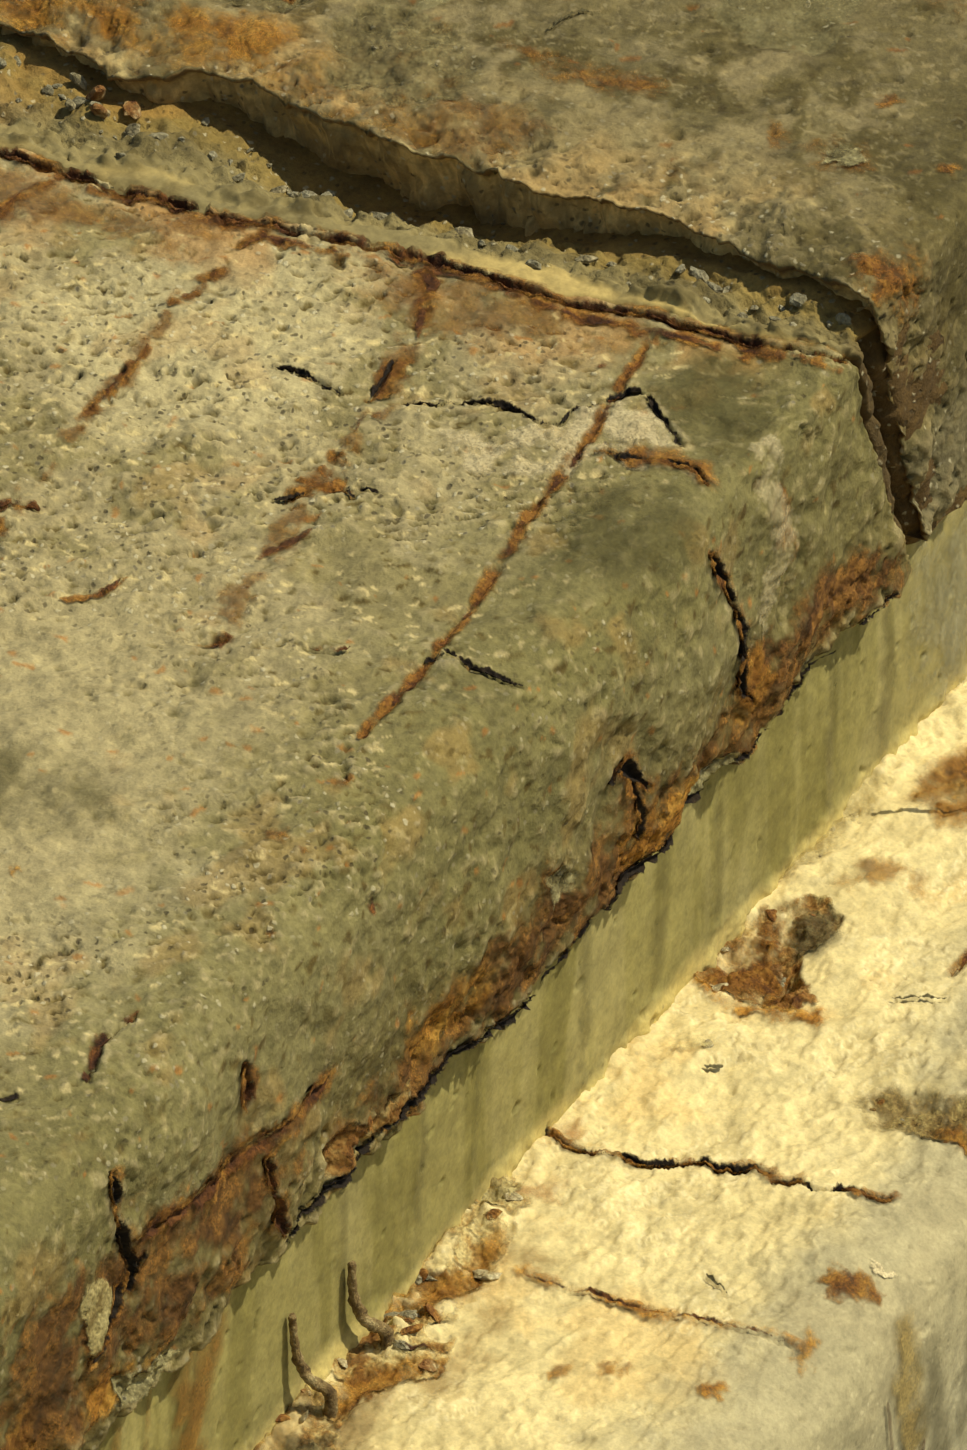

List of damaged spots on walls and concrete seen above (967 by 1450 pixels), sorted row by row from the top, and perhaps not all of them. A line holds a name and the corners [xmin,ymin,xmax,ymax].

crack [0,27,967,545]
corrosion [356,255,843,739]
crack [262,551,836,1243]
corrosion [396,545,904,1117]
spalling [694,893,844,1026]
spalling [80,1278,113,1364]
corrosion [0,1067,337,1450]
spalling [253,1174,529,1450]
crack [516,1266,804,1349]
crack [545,1126,900,1204]
corrosion [818,1268,882,1305]
spalling [859,1087,967,1154]